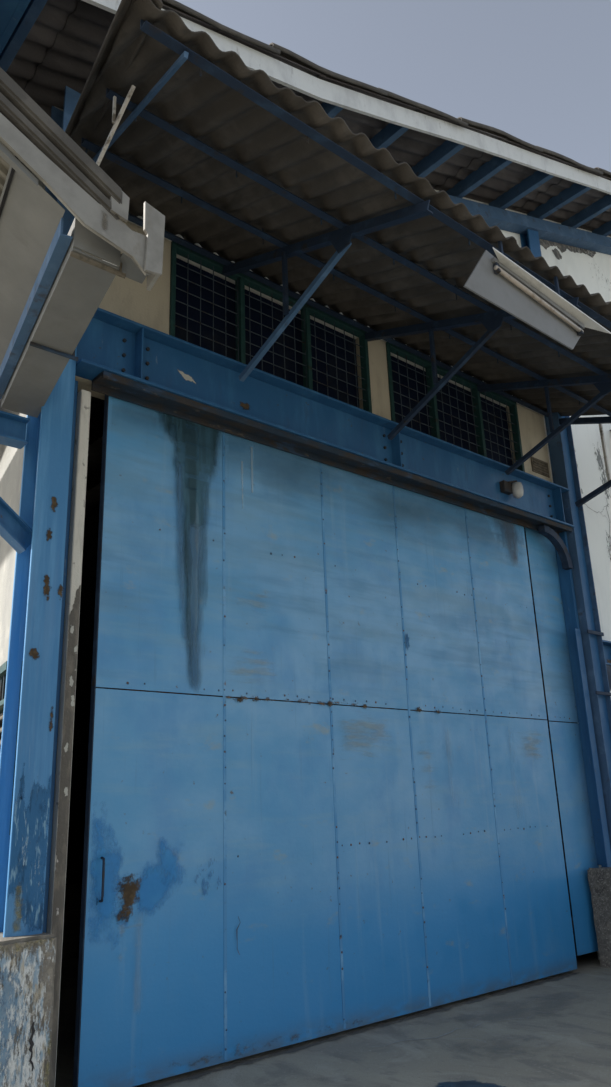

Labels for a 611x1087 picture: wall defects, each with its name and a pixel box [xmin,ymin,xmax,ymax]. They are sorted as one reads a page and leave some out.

rust [43,575,63,601]
damp [163,413,219,686]
crack [586,458,611,558]
peeling [0,585,81,1087]
rust [117,874,141,922]